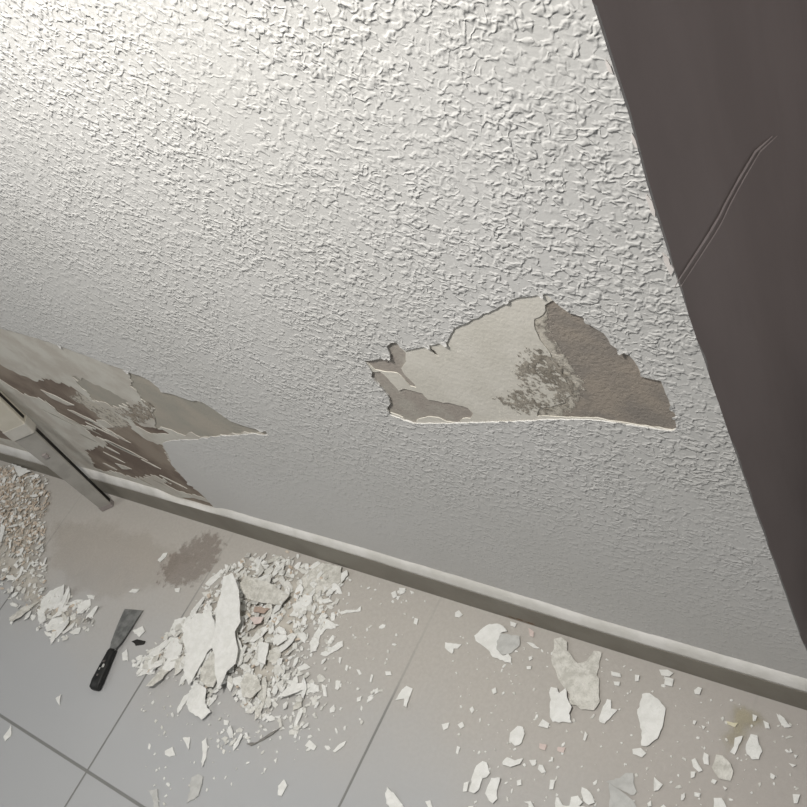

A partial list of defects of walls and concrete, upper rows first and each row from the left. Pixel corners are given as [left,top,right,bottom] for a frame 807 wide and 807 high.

peeling [0,328,267,506]
peeling [366,294,677,430]